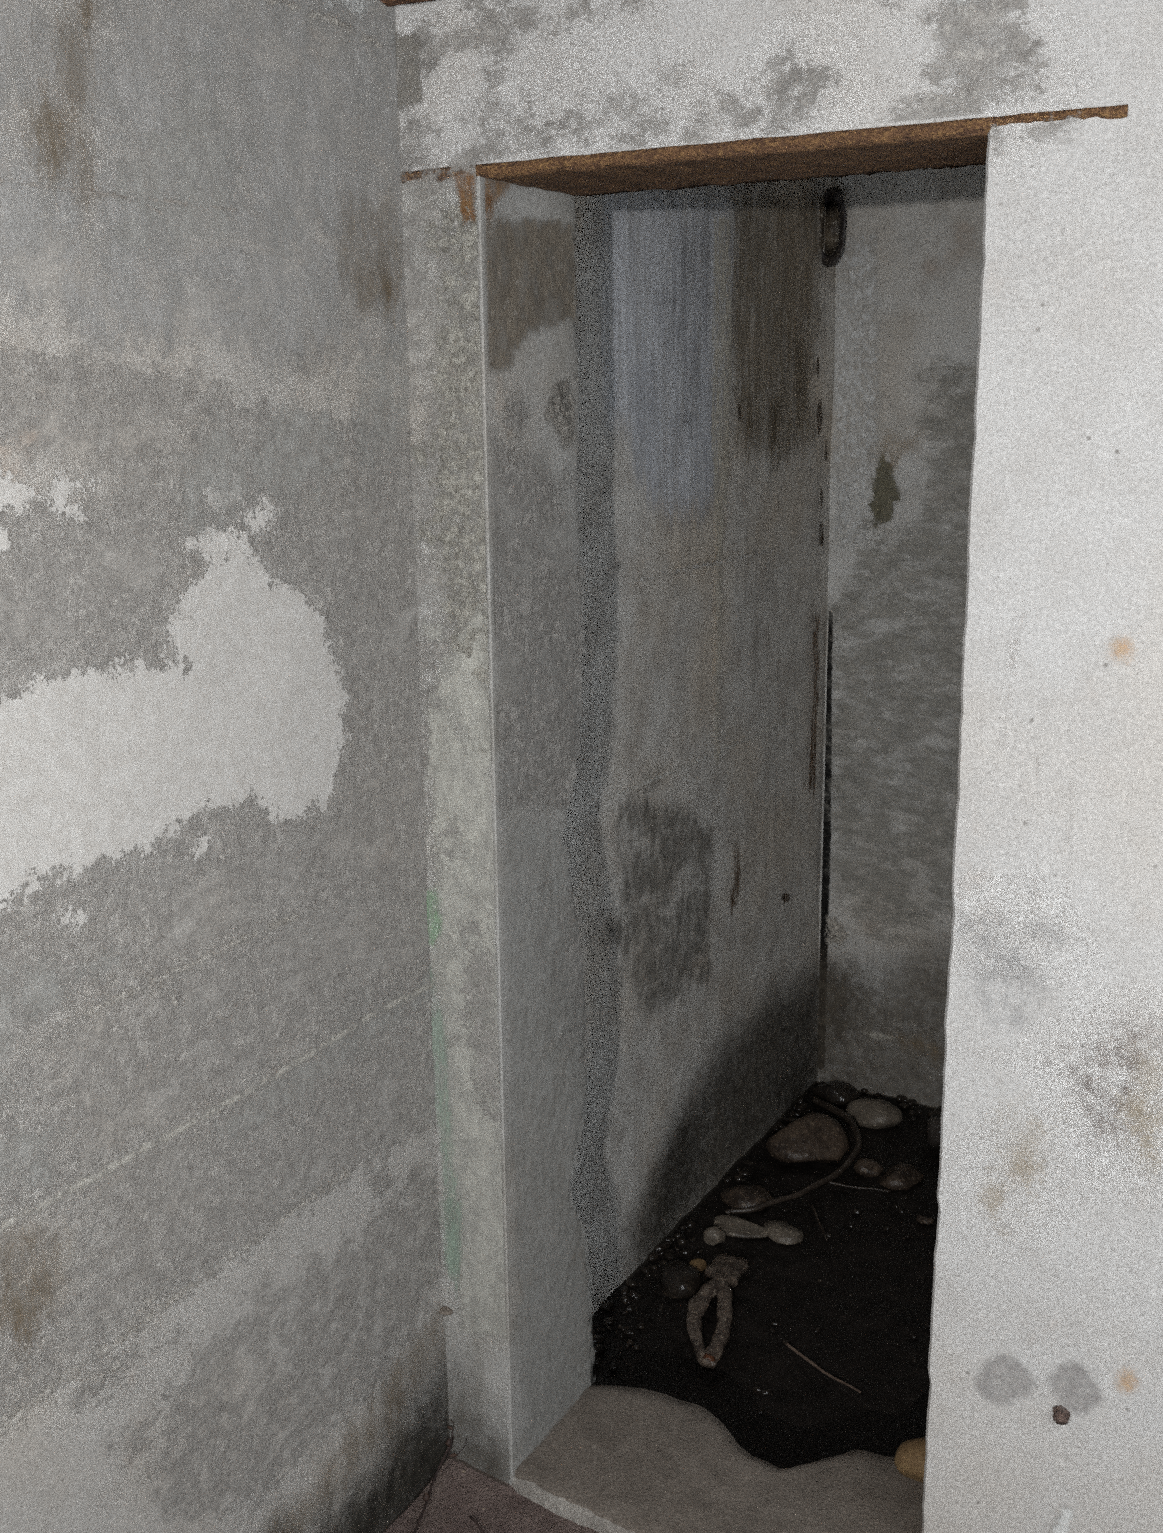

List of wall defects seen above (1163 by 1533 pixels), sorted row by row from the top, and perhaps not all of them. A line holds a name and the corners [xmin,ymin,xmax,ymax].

peeling [684,50,839,143]
peeling [0,0,669,1426]
peeling [610,780,711,1010]
water stain [332,1376,450,1533]